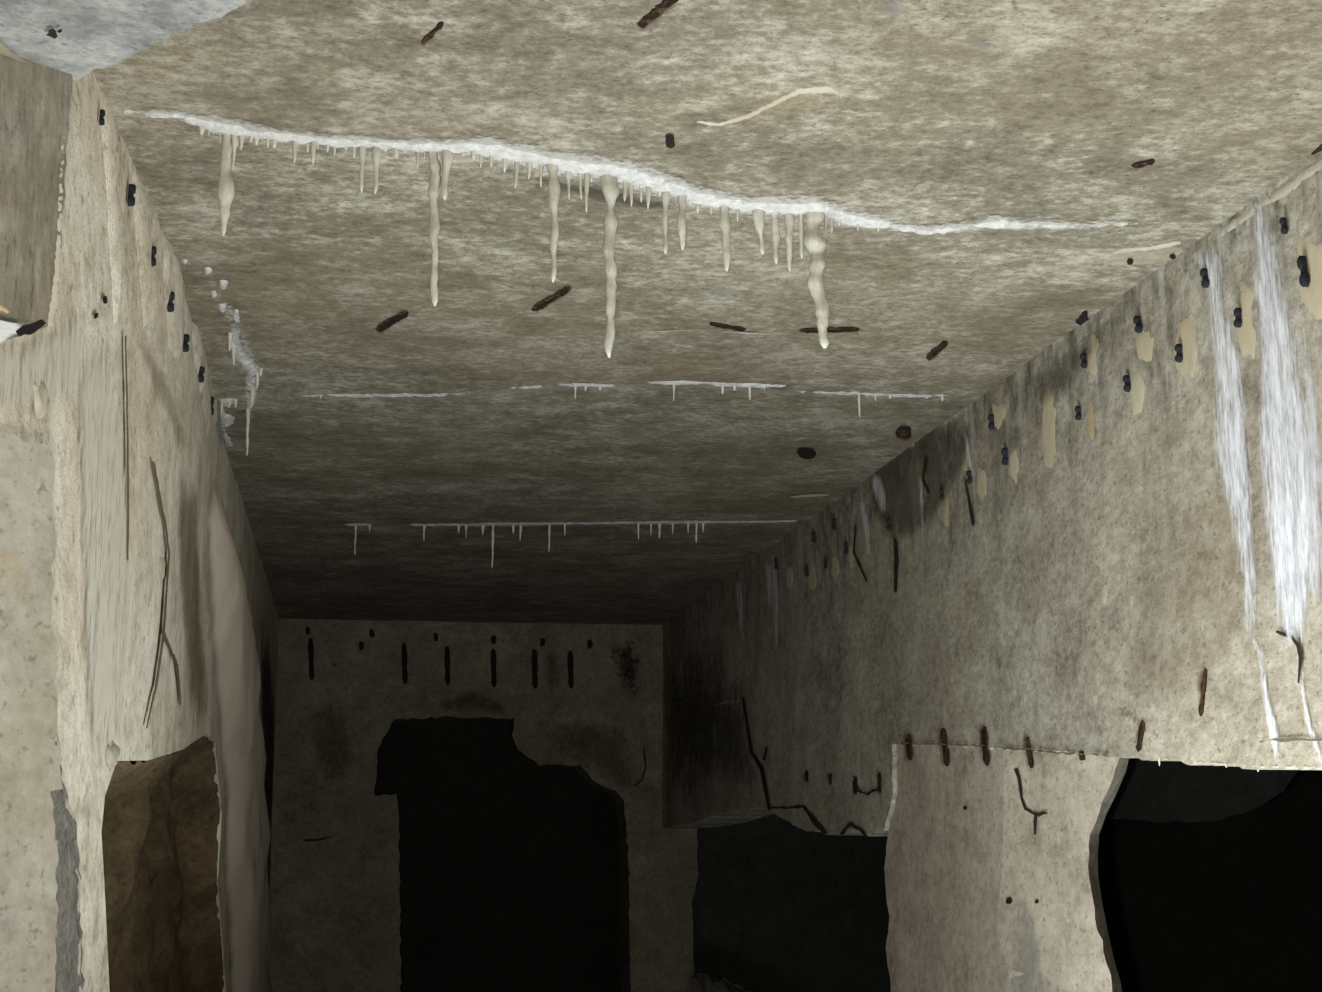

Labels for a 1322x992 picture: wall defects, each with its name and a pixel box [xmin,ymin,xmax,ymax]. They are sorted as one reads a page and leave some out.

corrosion [637,0,679,28]
damp [204,267,264,456]
corrosion [375,311,409,333]
corrosion [531,286,571,311]
crack [124,110,1139,399]
peeling [1174,318,1197,377]
peeling [1297,236,1322,320]
damp [1199,208,1318,640]
spalling [0,94,224,992]
crack [1276,630,1302,683]
damp [1148,677,1322,772]
crack [900,742,1109,835]